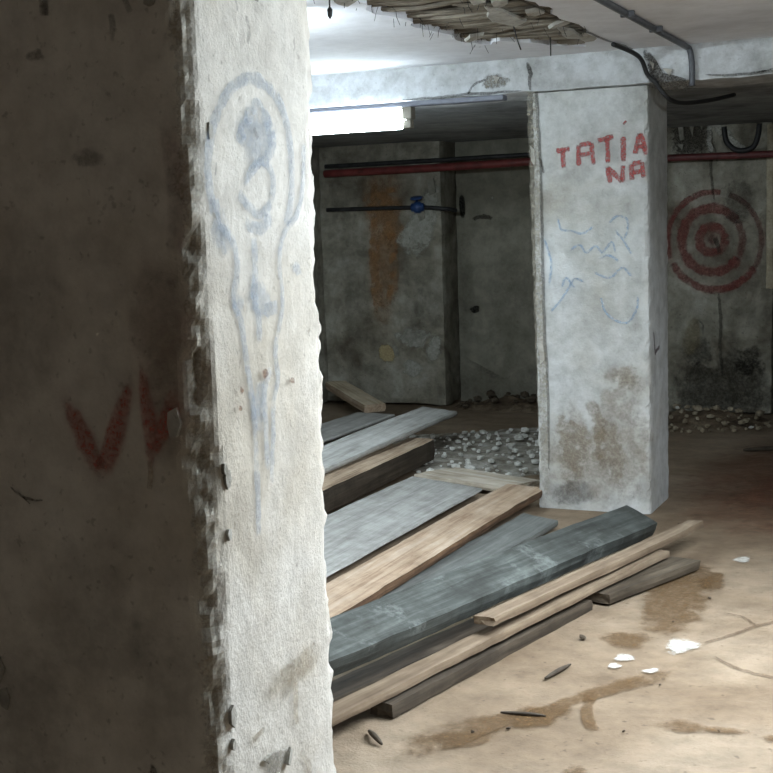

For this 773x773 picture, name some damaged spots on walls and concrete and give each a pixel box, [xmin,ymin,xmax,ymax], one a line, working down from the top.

spalling [327,0,597,56]
spalling [167,0,237,773]
damp [642,567,723,634]
damp [603,632,644,647]
crack [704,613,769,676]
damp [410,674,662,753]
damp [666,720,741,733]